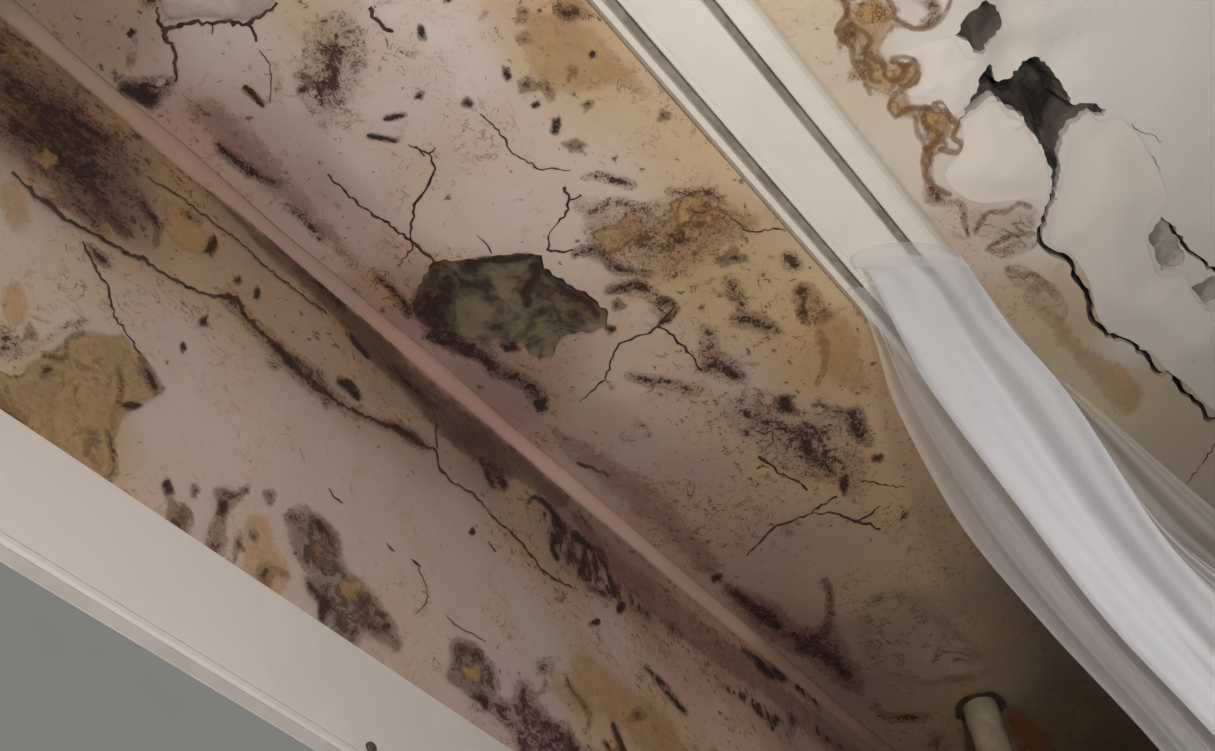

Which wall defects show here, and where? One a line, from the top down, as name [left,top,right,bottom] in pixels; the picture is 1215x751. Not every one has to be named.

flaking render [0,330,165,482]
crack [155,2,278,103]
crack [12,171,572,588]
crack [327,144,436,266]
leakage [204,192,651,618]
flaking render [413,253,608,360]
leakage [572,171,784,337]
leakage [625,323,883,504]
leakage [835,0,964,206]
hole [957,0,1002,51]
hole [970,56,1102,188]
crack [1037,189,1215,500]